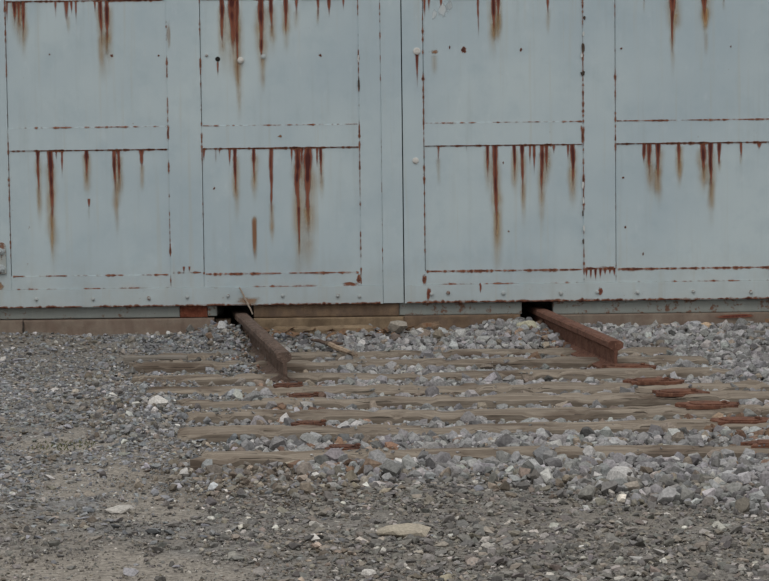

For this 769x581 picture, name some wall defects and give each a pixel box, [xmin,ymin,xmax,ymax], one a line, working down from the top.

corrosion [4,0,162,42]
corrosion [219,0,239,69]
corrosion [258,0,273,54]
corrosion [283,0,298,31]
corrosion [491,0,500,36]
corrosion [7,143,167,241]
corrosion [201,122,361,242]
corrosion [415,0,437,236]
corrosion [437,52,585,234]
corrosion [614,112,767,183]
corrosion [407,250,769,304]